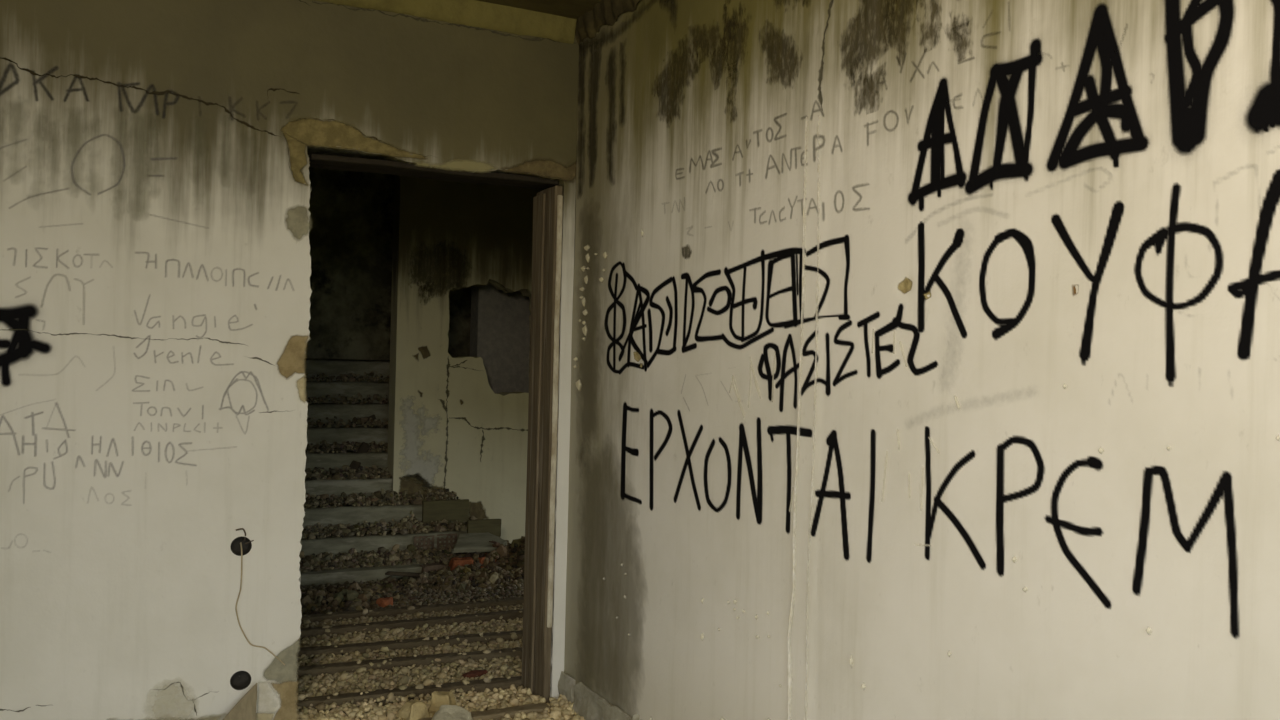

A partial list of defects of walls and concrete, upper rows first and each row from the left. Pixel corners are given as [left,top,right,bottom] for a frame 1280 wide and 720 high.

crack [1,58,387,175]
flaking render [281,119,577,186]
damp [578,15,635,194]
damp [654,6,802,124]
damp [842,0,969,111]
flaking render [277,335,309,402]
flaking render [414,346,430,360]
peeling [399,391,446,499]
flaking render [469,501,488,520]